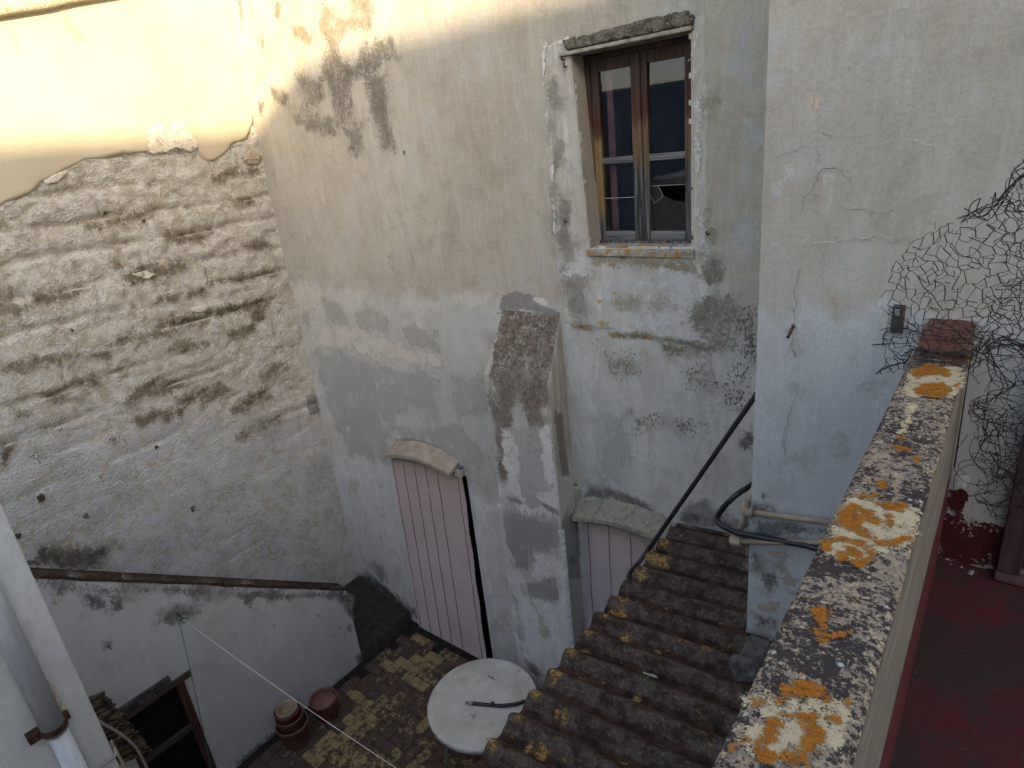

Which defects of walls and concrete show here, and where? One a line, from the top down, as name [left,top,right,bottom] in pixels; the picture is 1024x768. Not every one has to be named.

water stain [292,0,405,159]
flaking render [144,120,199,154]
flaking render [43,171,67,185]
crack [776,120,901,244]
water stain [549,138,759,412]
peeling [499,428,520,489]
peeling [538,424,556,488]